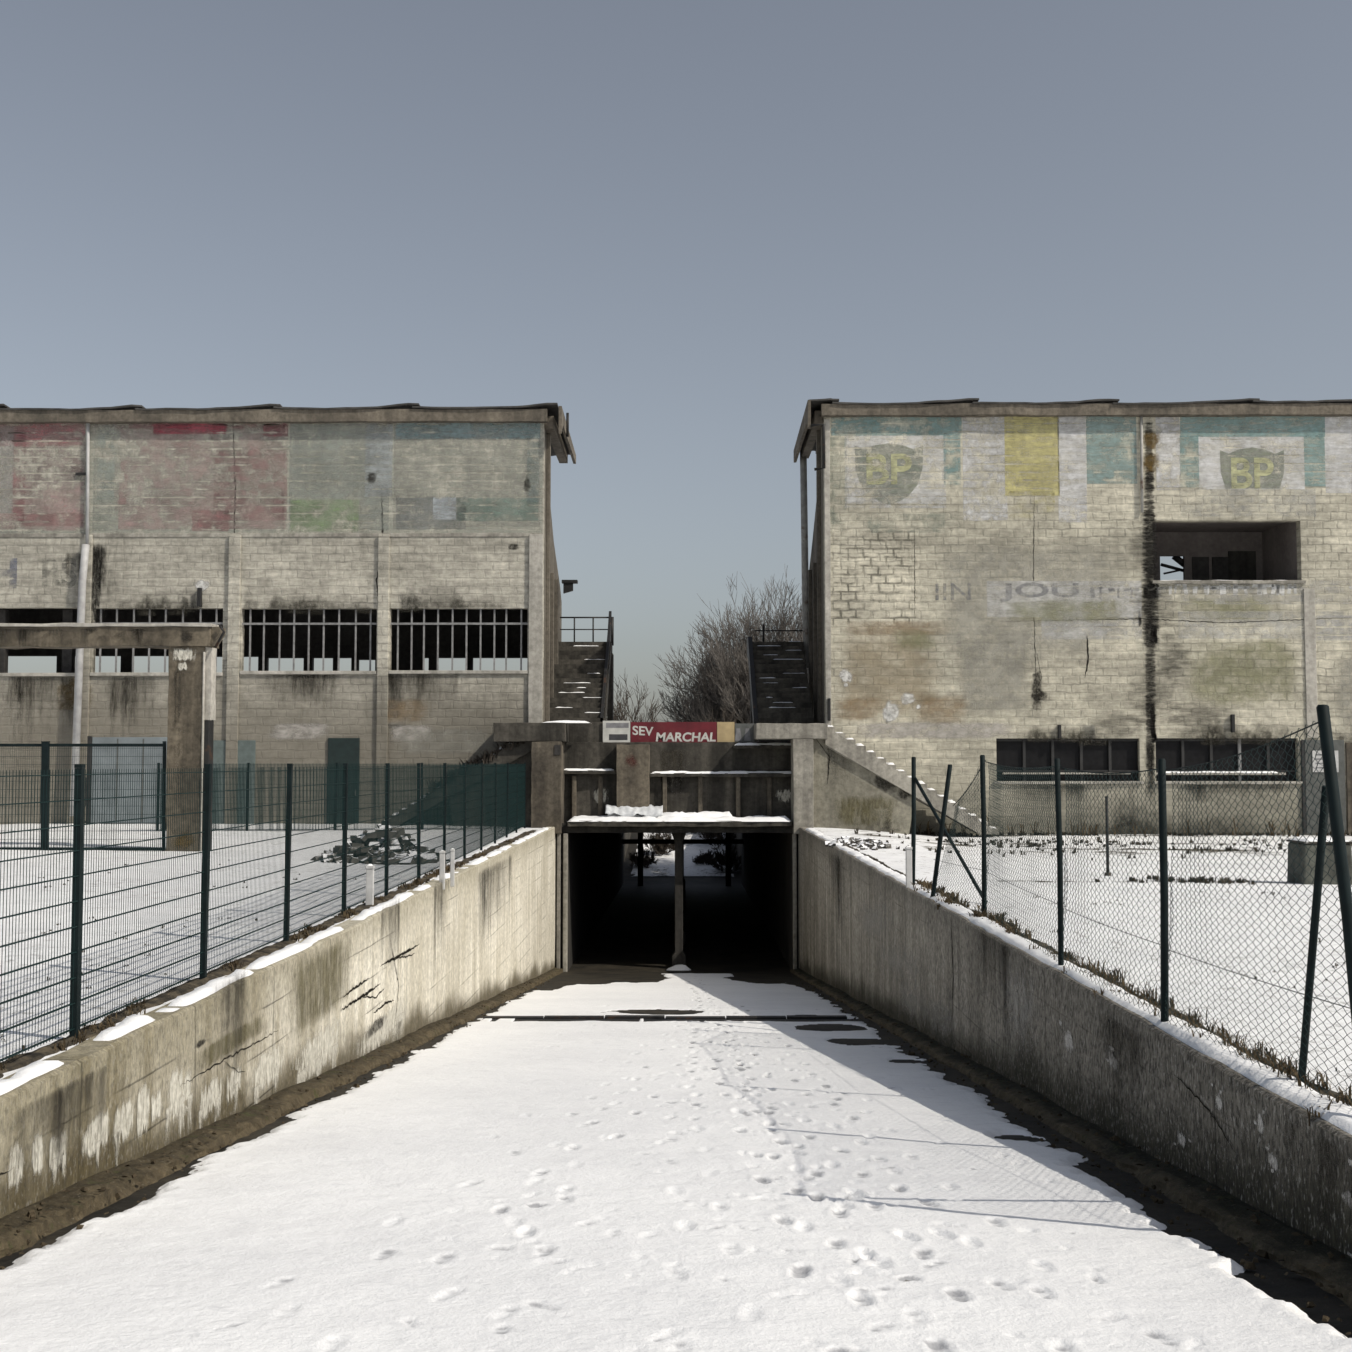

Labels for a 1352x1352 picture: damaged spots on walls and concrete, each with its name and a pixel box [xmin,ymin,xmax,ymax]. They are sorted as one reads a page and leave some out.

water stain [1142,422,1159,784]
crack [341,940,419,1018]
water stain [358,999,406,1056]